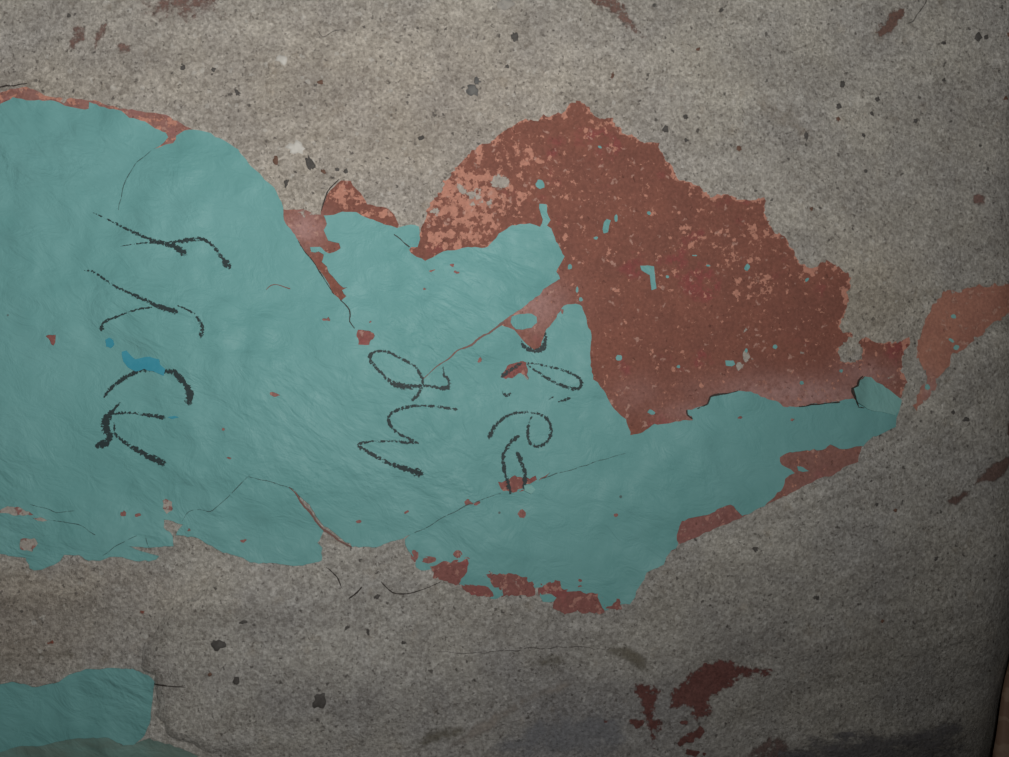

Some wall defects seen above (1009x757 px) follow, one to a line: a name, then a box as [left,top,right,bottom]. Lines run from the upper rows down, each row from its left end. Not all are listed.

peeling [0,87,1009,615]
damp [976,457,1009,483]
crack [414,493,501,533]
damp [948,491,968,505]